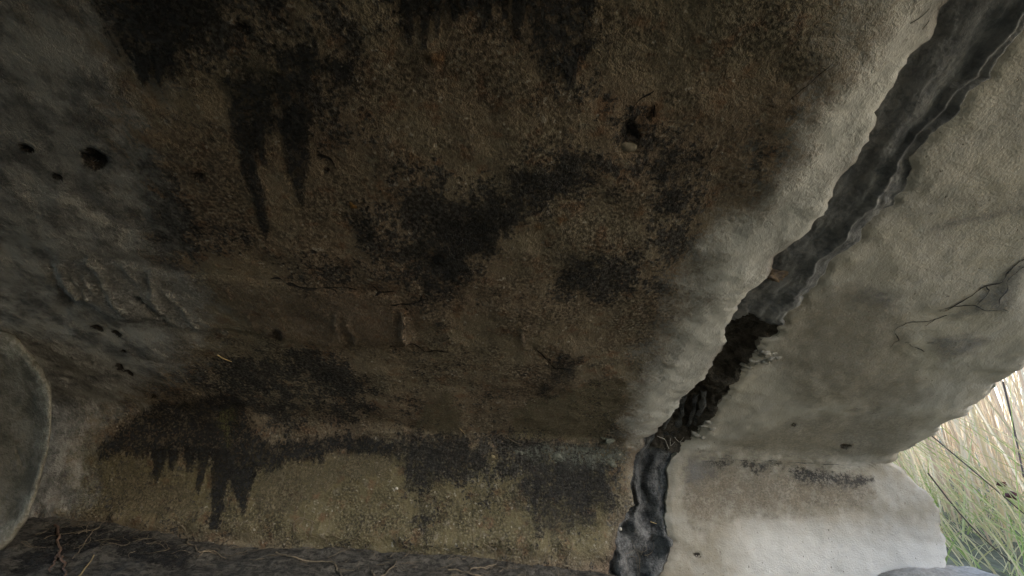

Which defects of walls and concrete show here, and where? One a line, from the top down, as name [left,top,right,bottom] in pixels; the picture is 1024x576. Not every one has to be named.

leakage [90,0,224,88]
leakage [401,0,597,90]
leakage [219,35,368,241]
leakage [404,152,627,312]
crack [890,259,1024,352]
leakage [96,391,494,537]
leakage [509,437,626,550]